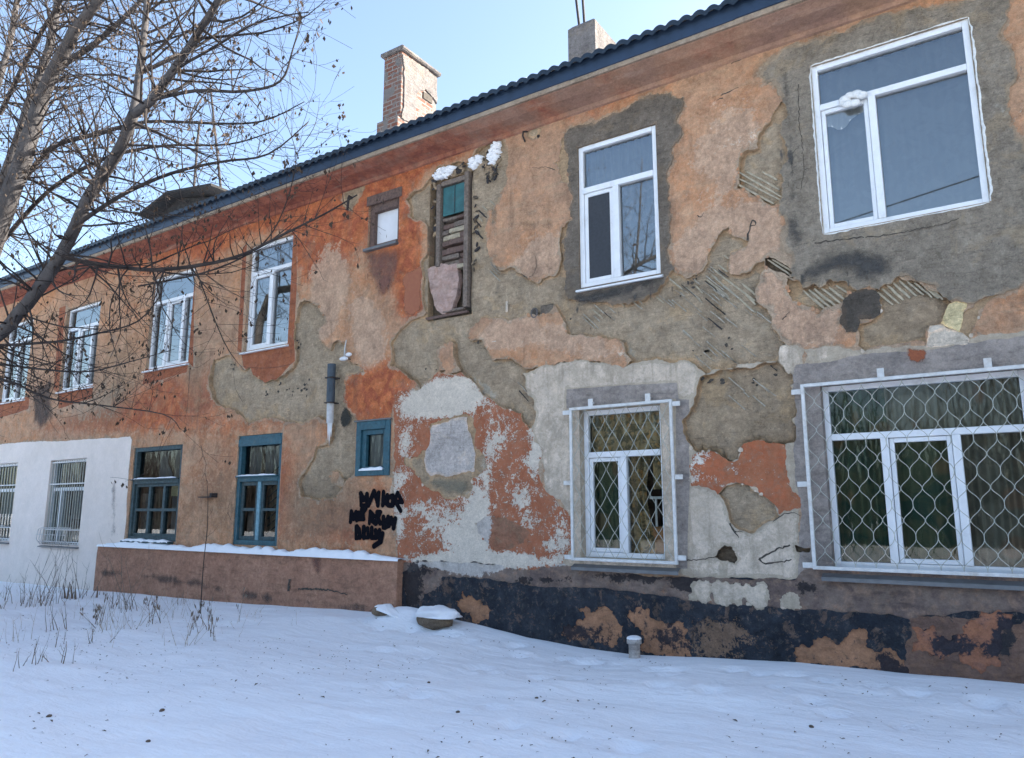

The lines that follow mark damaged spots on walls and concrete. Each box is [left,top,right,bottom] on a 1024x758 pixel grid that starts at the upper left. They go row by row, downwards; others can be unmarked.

spalling [736,99,788,207]
leakage [801,252,887,285]
crack [815,218,959,244]
spalling [208,300,363,501]
spalling [390,137,857,608]
crack [758,544,792,565]